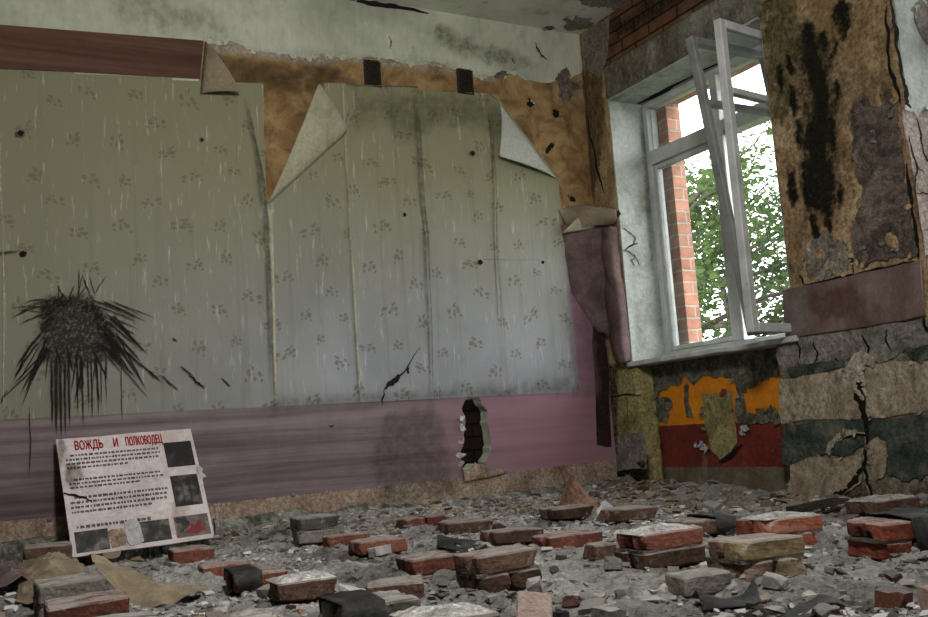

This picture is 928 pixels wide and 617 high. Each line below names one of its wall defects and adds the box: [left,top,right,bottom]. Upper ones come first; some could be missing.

crack [353,0,429,14]
peeling [199,38,458,204]
peeling [473,0,630,225]
damp [760,0,852,239]
crack [799,0,928,285]
spalling [802,89,928,280]
damp [1,274,178,433]
peeling [651,317,928,497]
crack [796,342,819,363]
crack [833,382,873,496]
crack [861,329,893,353]
spalling [71,540,204,566]